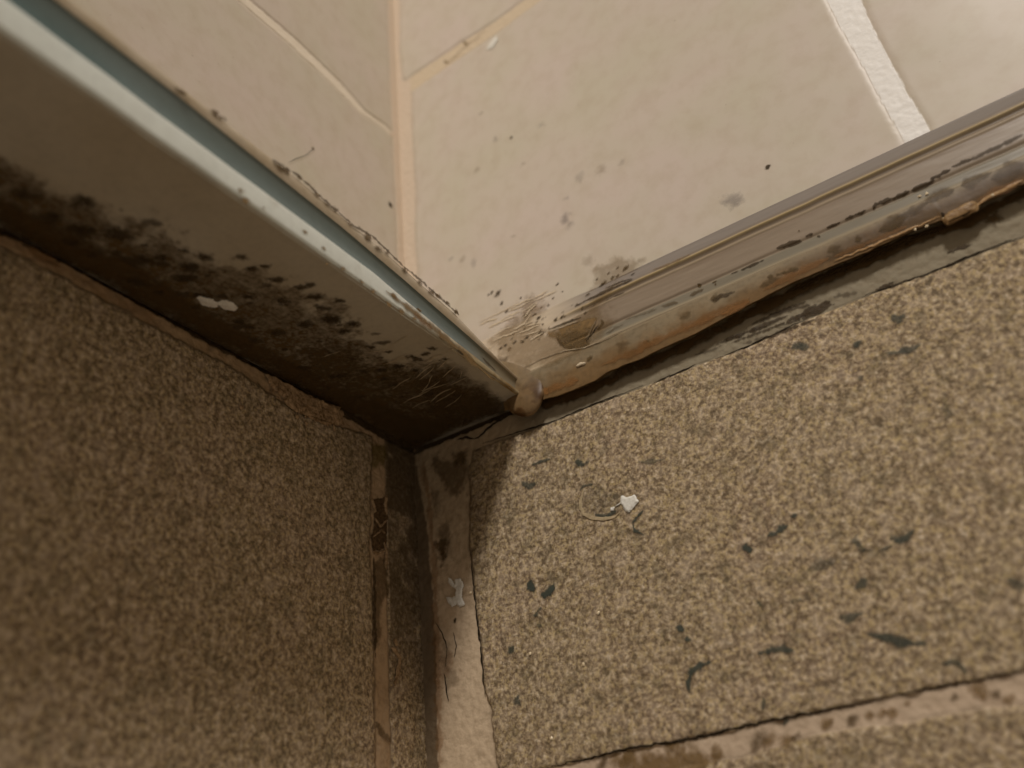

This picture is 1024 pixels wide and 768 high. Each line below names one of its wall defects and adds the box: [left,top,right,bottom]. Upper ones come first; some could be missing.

water stain [0,158,513,493]
water stain [499,266,634,350]
water stain [541,134,1024,409]
peeling [834,180,1023,261]